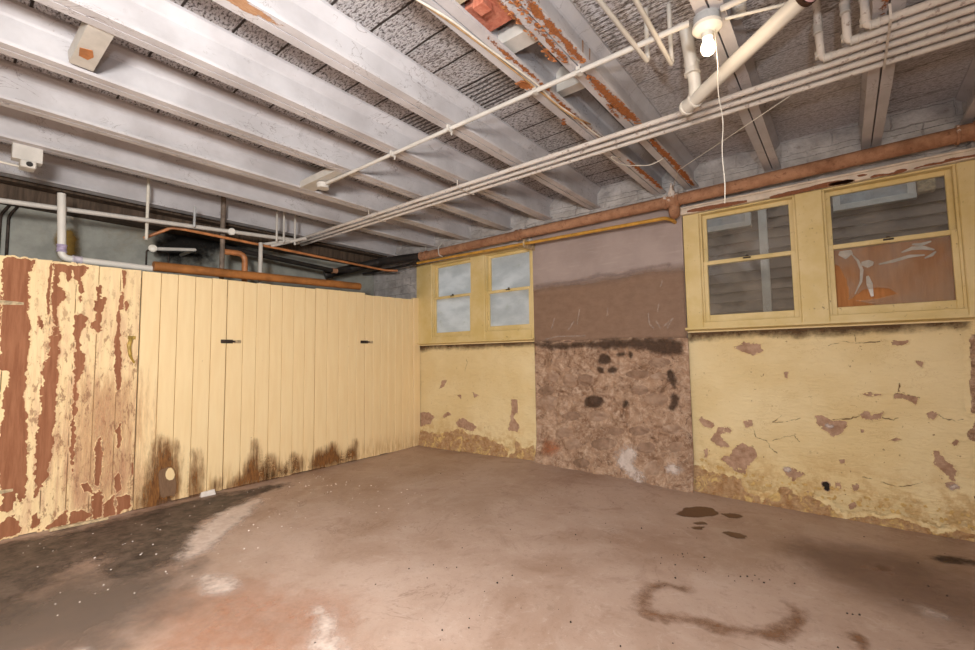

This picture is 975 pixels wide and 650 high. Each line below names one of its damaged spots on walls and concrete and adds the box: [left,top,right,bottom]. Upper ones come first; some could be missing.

corrosion [227,0,277,25]
corrosion [497,0,590,63]
corrosion [487,37,600,138]
corrosion [586,75,642,124]
corrosion [649,139,694,186]
peeling [0,255,134,541]
leakage [312,442,357,469]
spalling [419,329,975,542]
leakage [677,506,742,530]
leakage [0,440,300,650]
leakage [309,607,338,650]
leakage [639,583,739,634]